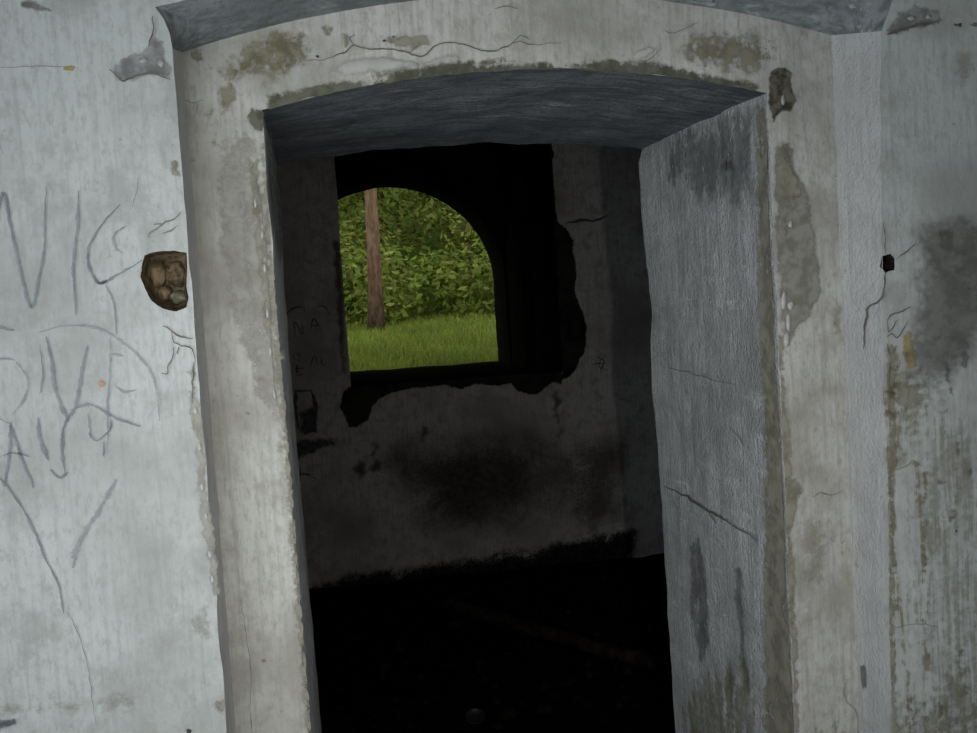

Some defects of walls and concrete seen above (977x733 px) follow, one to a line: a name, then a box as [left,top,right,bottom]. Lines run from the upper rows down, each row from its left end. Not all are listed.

flaking render [109,16,171,82]
flaking render [383,36,429,49]
crack [307,35,561,61]
flaking render [887,5,942,35]
flaking render [768,68,796,122]
flaking render [774,143,821,347]
spalling [140,251,189,311]
flaking render [340,143,608,427]
crack [863,223,917,385]
water stain [892,217,977,434]
crack [664,486,757,541]